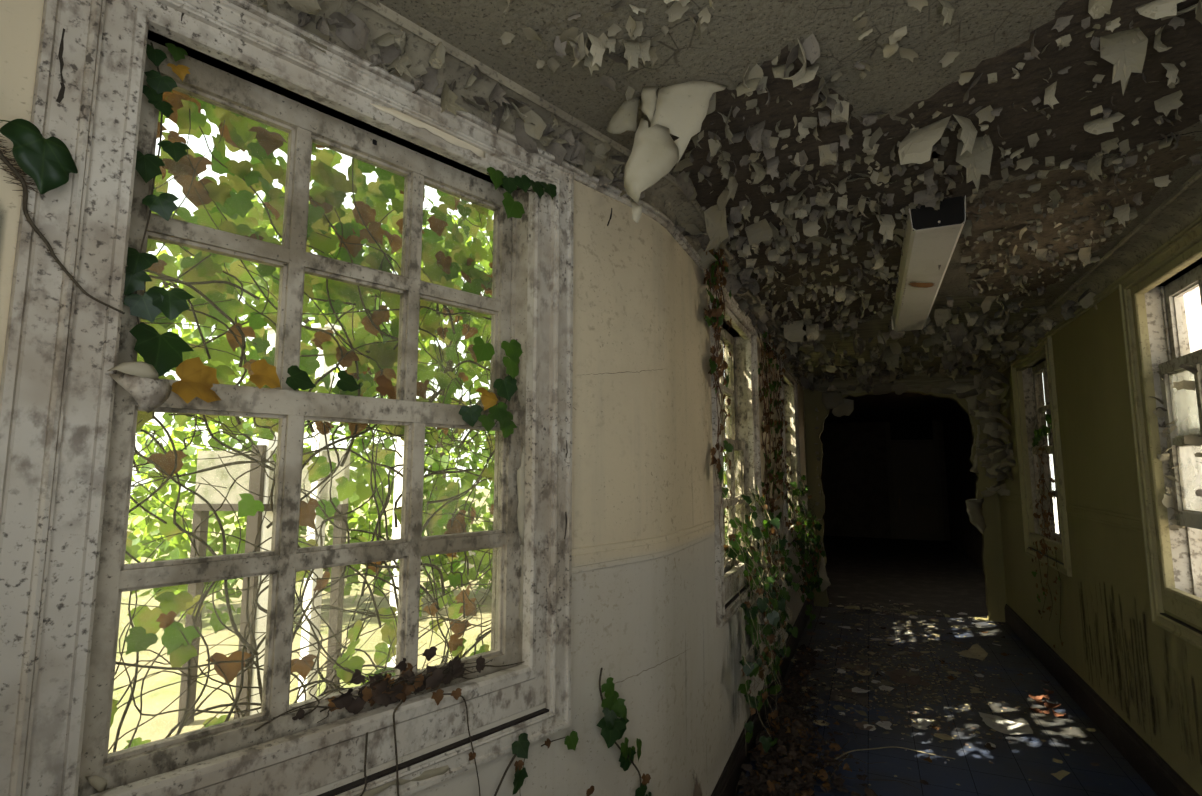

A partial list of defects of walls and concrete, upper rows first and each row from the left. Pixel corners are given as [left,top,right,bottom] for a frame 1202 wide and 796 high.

spalling [56,28,65,103]
peeling [249,0,1202,474]
peeling [107,361,172,413]
peeling [1150,396,1202,531]
peeling [517,446,525,632]
peeling [814,556,831,592]
peeling [965,498,987,534]